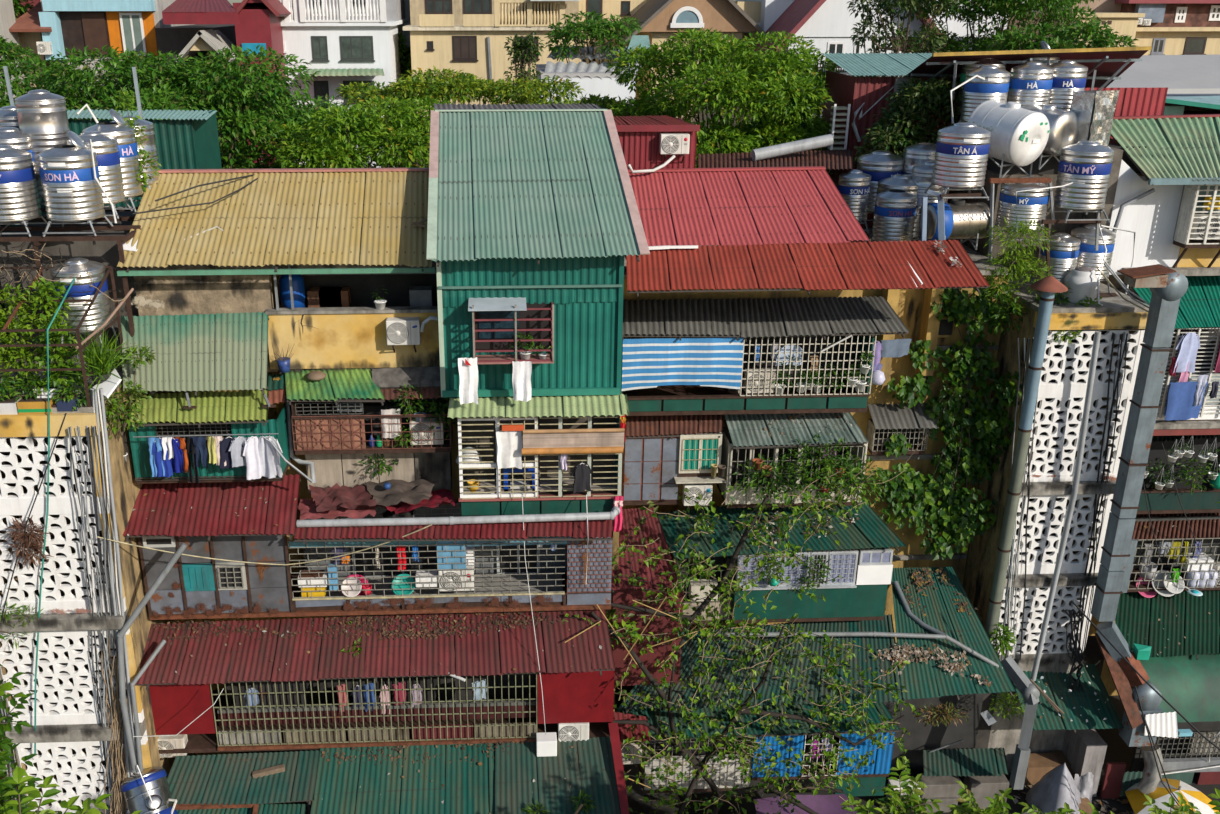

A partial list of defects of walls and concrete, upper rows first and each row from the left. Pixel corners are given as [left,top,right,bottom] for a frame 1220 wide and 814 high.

damp [131,278,153,293]
damp [170,275,208,308]
damp [231,278,251,294]
damp [408,352,440,367]
corrosion [153,563,279,619]